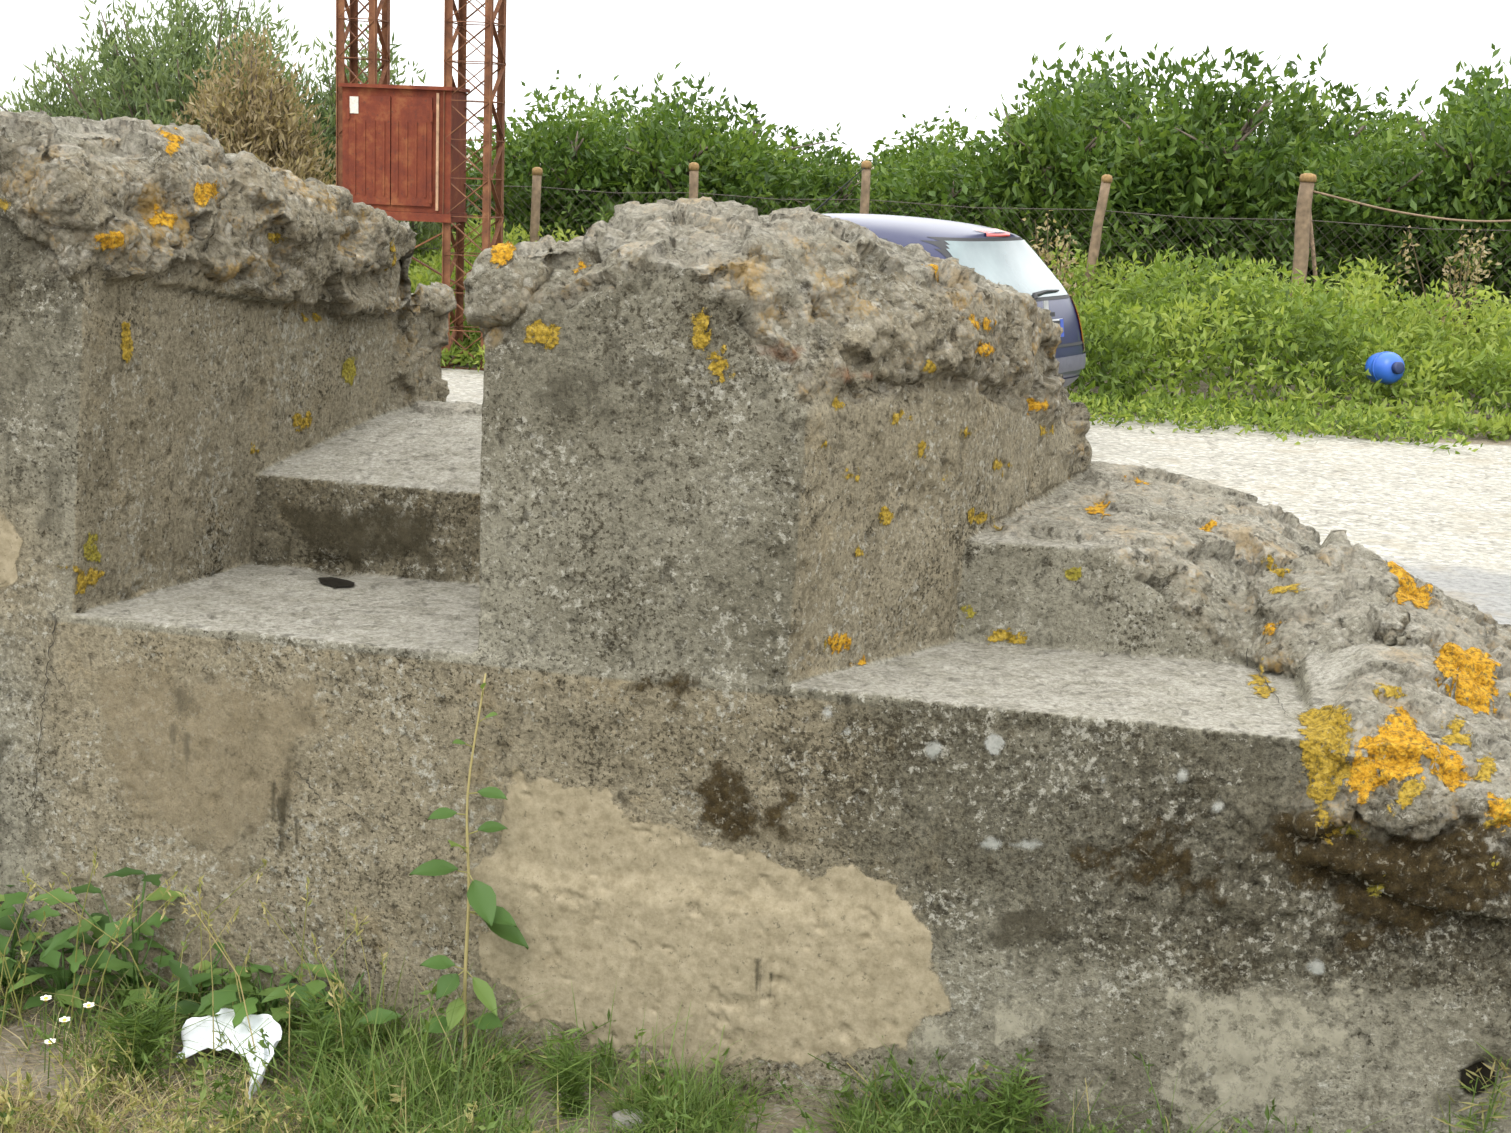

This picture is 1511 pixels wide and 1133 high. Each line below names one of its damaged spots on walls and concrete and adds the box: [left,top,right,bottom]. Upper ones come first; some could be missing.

spalling [0,110,374,295]
spalling [293,281,442,322]
peeling [0,509,23,587]
spalling [463,196,1511,877]
peeling [464,767,951,1074]